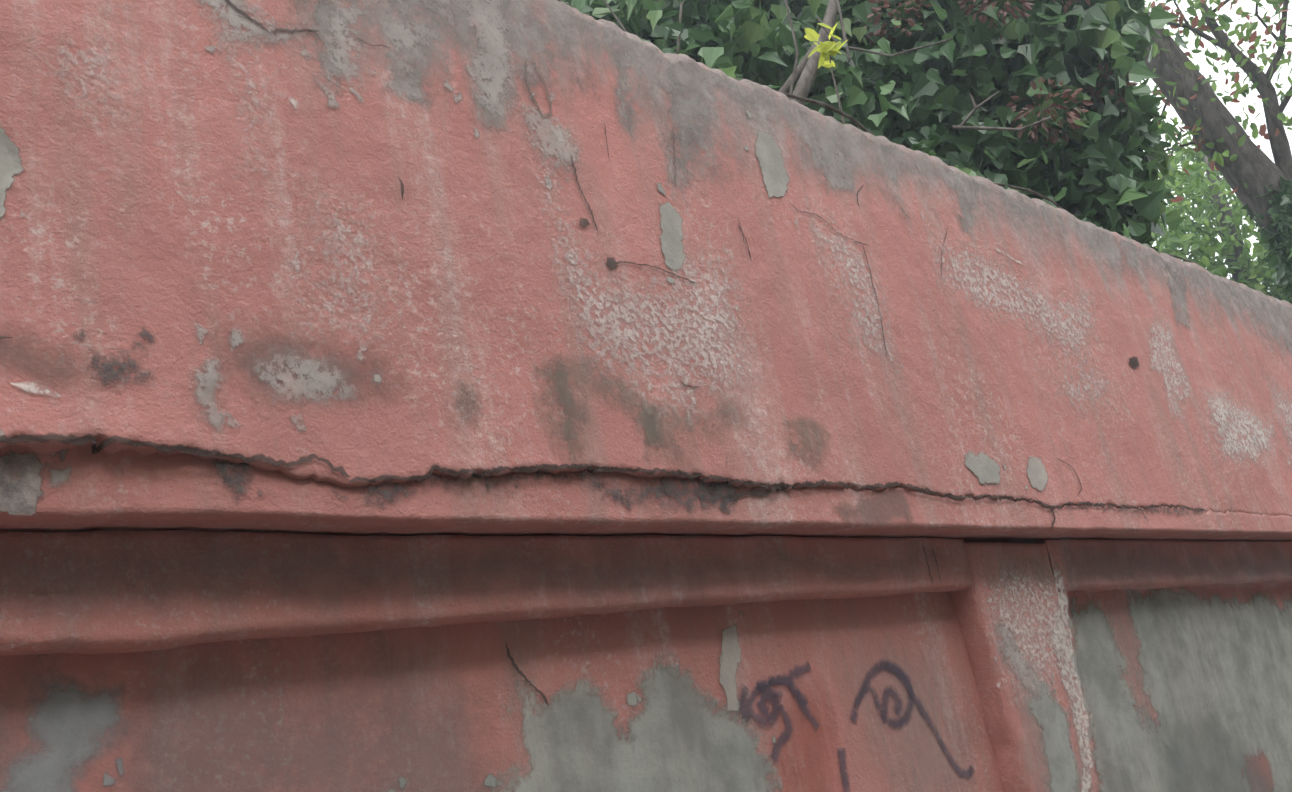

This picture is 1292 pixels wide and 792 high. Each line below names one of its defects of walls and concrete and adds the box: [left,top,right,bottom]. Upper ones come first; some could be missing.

crack [226,0,320,33]
leakage [308,0,557,126]
flaking render [0,127,26,218]
peeling [745,110,789,198]
leakage [583,21,1058,232]
peeling [557,182,745,416]
peeling [255,351,353,431]
flaking render [0,449,70,516]
crack [0,433,1205,529]
peeling [2,682,123,792]
peeling [484,611,782,792]
peeling [983,566,1292,792]